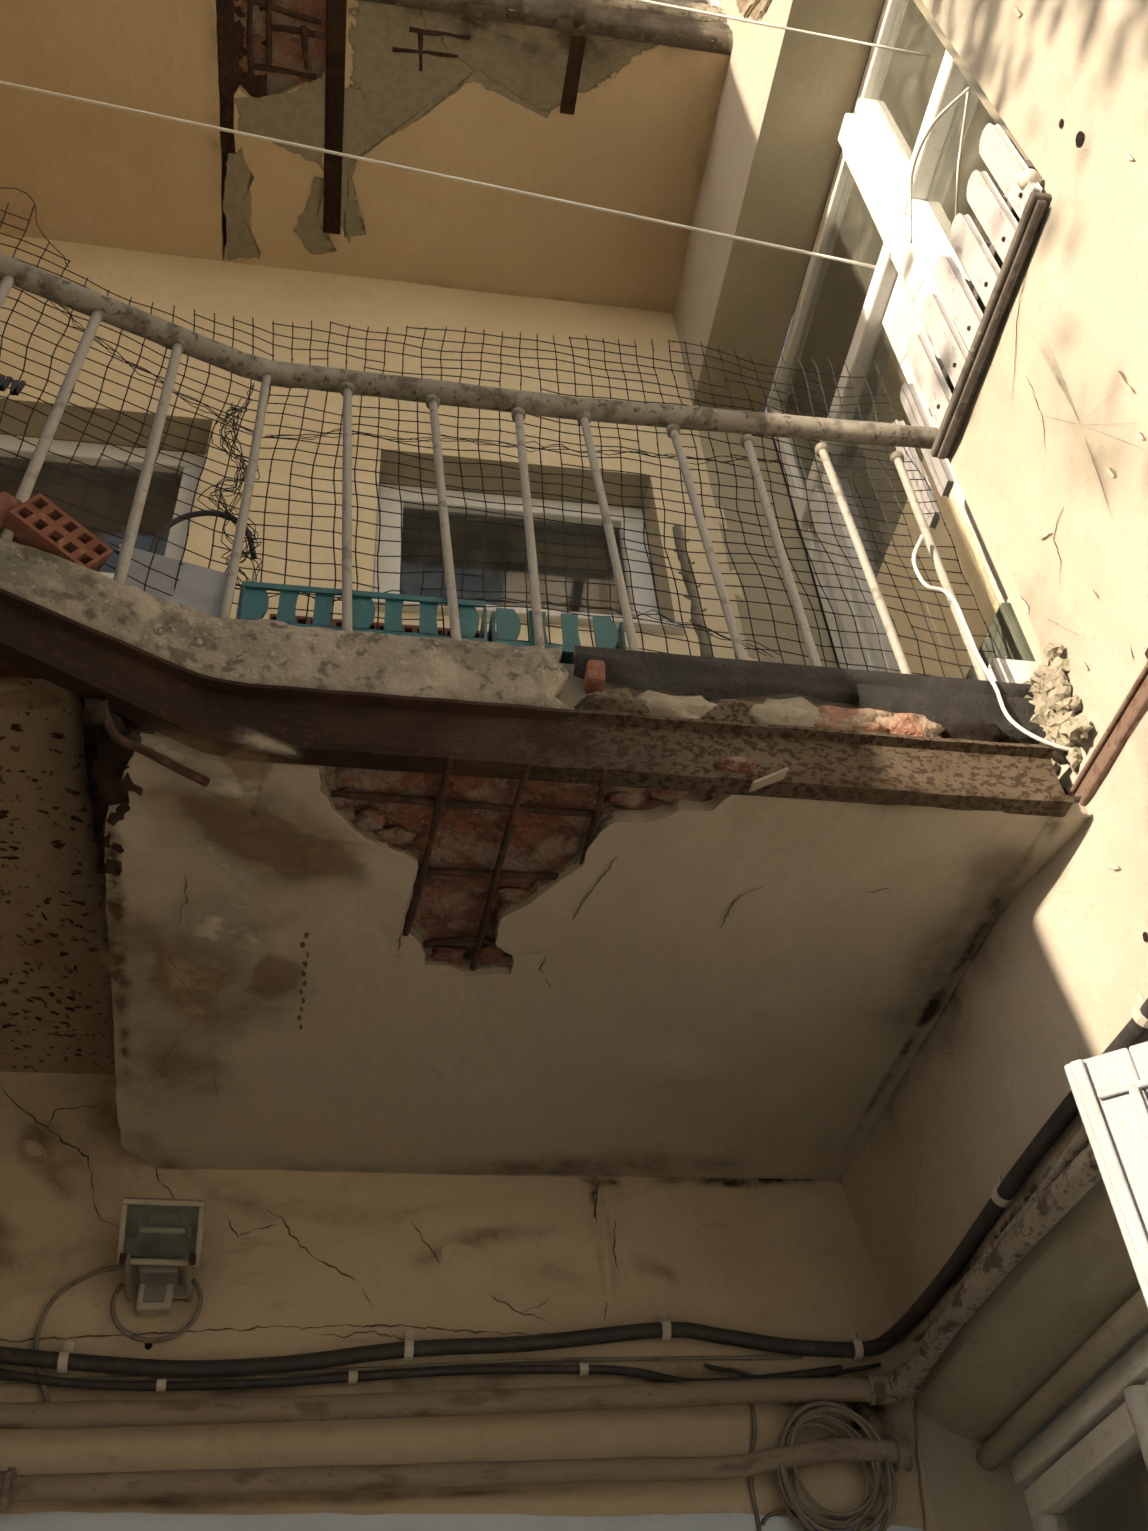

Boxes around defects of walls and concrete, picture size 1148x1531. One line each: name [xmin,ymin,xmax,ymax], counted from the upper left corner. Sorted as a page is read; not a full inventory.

peeling [736,0,770,21]
peeling [216,0,658,260]
rust [0,810,26,860]
spalling [316,757,726,971]
spalling [712,756,789,792]
rust [871,788,916,803]
rust [0,862,102,1059]
leakage [901,987,957,1055]
crack [0,1084,119,1228]
crack [0,1208,555,1344]
crack [592,1182,618,1321]